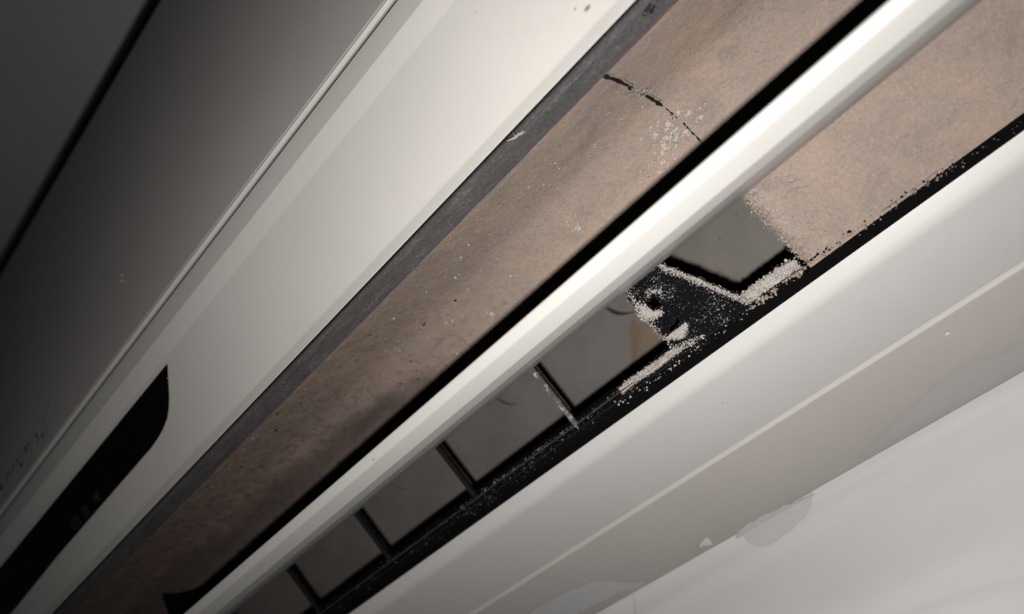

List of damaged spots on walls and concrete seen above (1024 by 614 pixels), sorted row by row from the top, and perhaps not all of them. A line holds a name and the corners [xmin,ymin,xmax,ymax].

crack [603,73,707,148]
peeling [658,160,965,320]